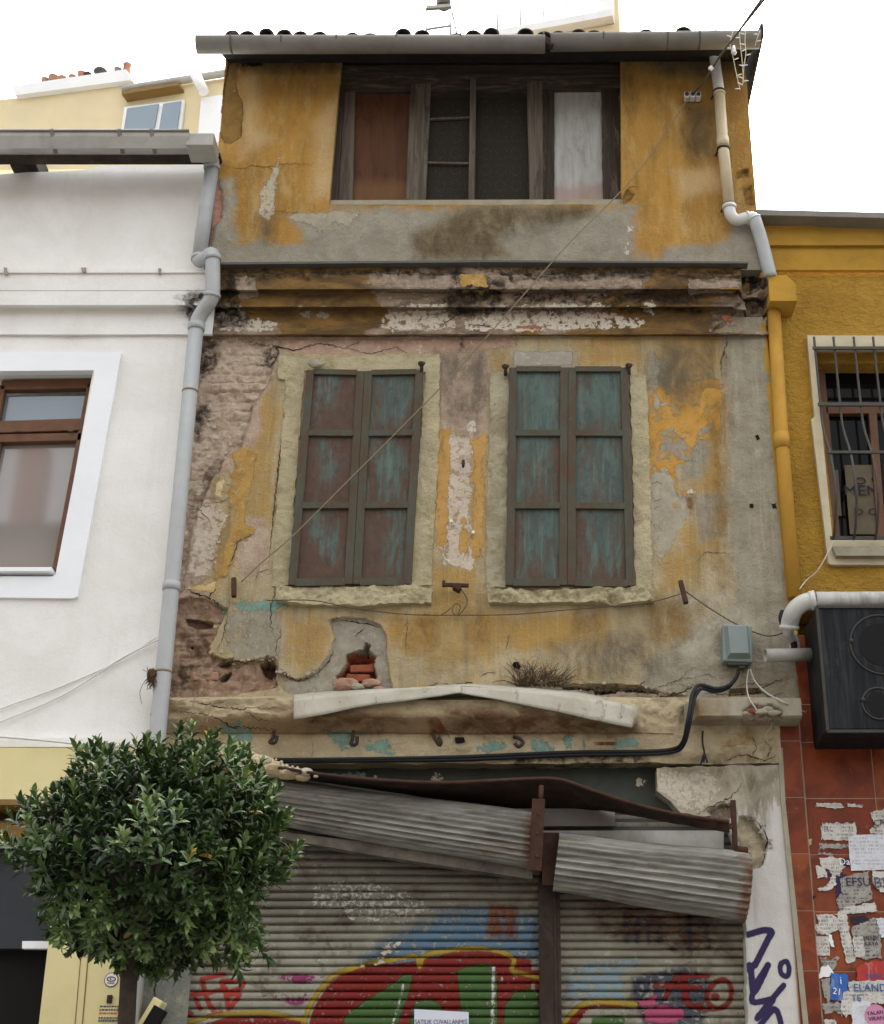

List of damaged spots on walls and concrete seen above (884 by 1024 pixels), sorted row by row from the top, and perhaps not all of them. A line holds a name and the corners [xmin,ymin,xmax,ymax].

peeling [220,63,260,144]
peeling [258,157,281,220]
spalling [687,270,768,337]
crack [242,339,405,361]
flaking render [170,273,656,698]
peeling [646,361,723,559]
crack [723,737,775,762]
peeling [636,769,773,868]